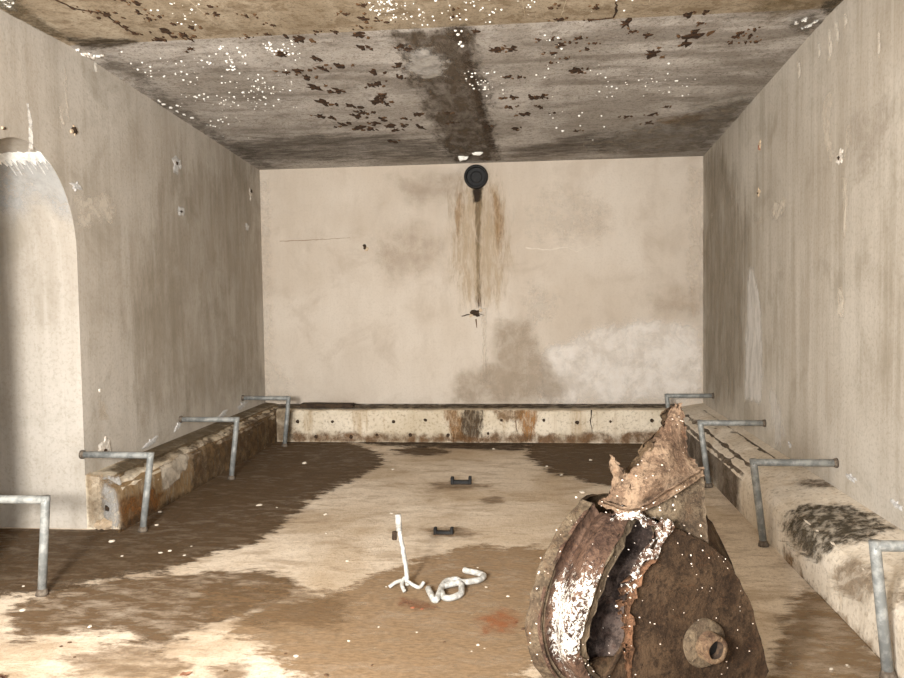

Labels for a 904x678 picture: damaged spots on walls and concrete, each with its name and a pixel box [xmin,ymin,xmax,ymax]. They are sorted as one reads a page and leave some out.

water stain [790,0,843,35]
water stain [393,27,498,162]
water stain [0,104,67,209]
rust [473,187,483,306]
water stain [353,321,701,408]
water stain [745,272,780,443]
rust [446,410,483,441]
rust [495,410,537,442]
water stain [684,410,750,510]
water stain [0,372,656,678]
water stain [766,504,896,678]